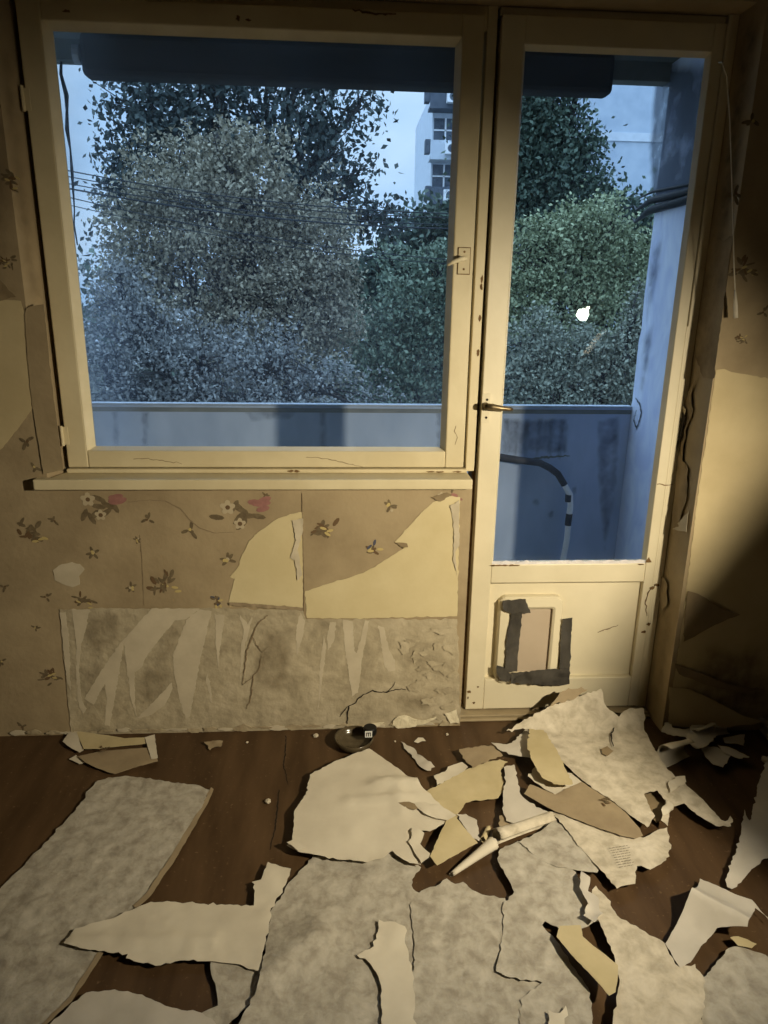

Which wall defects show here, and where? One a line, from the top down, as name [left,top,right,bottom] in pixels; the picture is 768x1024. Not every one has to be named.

peeling [290,518,303,580]
flaking render [10,602,479,736]
crack [242,615,268,706]
crack [340,683,405,727]